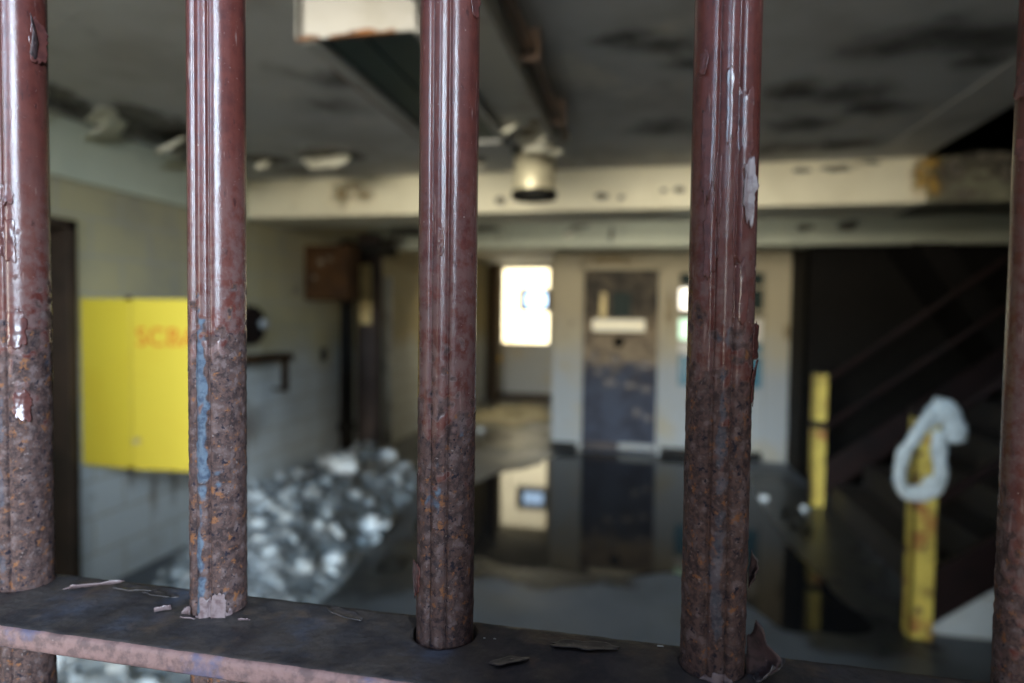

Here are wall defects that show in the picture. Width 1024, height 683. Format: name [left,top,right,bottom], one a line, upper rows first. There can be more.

peeling [28,13,49,64]
peeling [701,64,759,407]
peeling [181,592,233,619]
peeling [746,620,782,678]